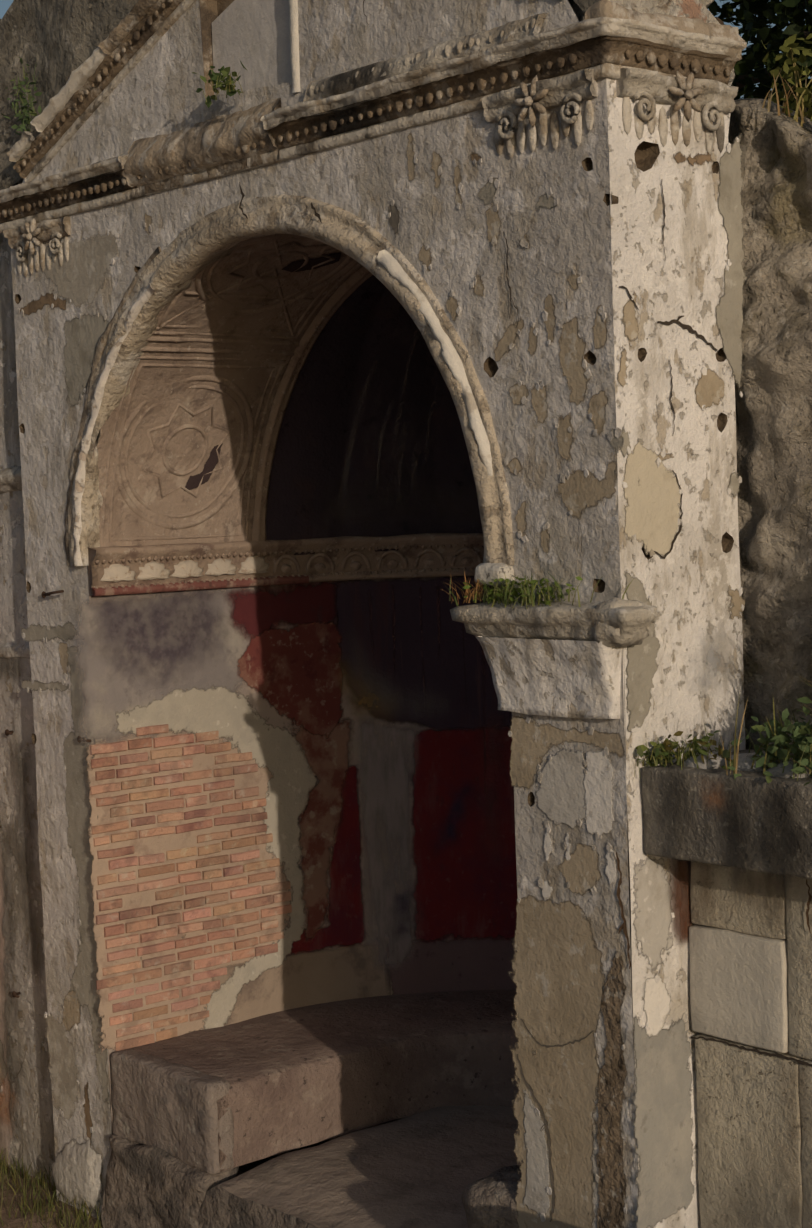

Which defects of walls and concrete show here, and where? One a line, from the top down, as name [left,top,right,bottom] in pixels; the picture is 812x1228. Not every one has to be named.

crack [659,181,667,261]
peeling [617,293,639,387]
crack [619,286,718,351]
peeling [673,134,747,411]
peeling [494,294,631,519]
crack [668,364,676,434]
crack [654,470,683,559]
damp [106,595,216,664]
peeling [728,585,746,622]
peeling [508,623,660,884]
flaking render [21,586,351,1145]
peeling [510,858,697,1228]